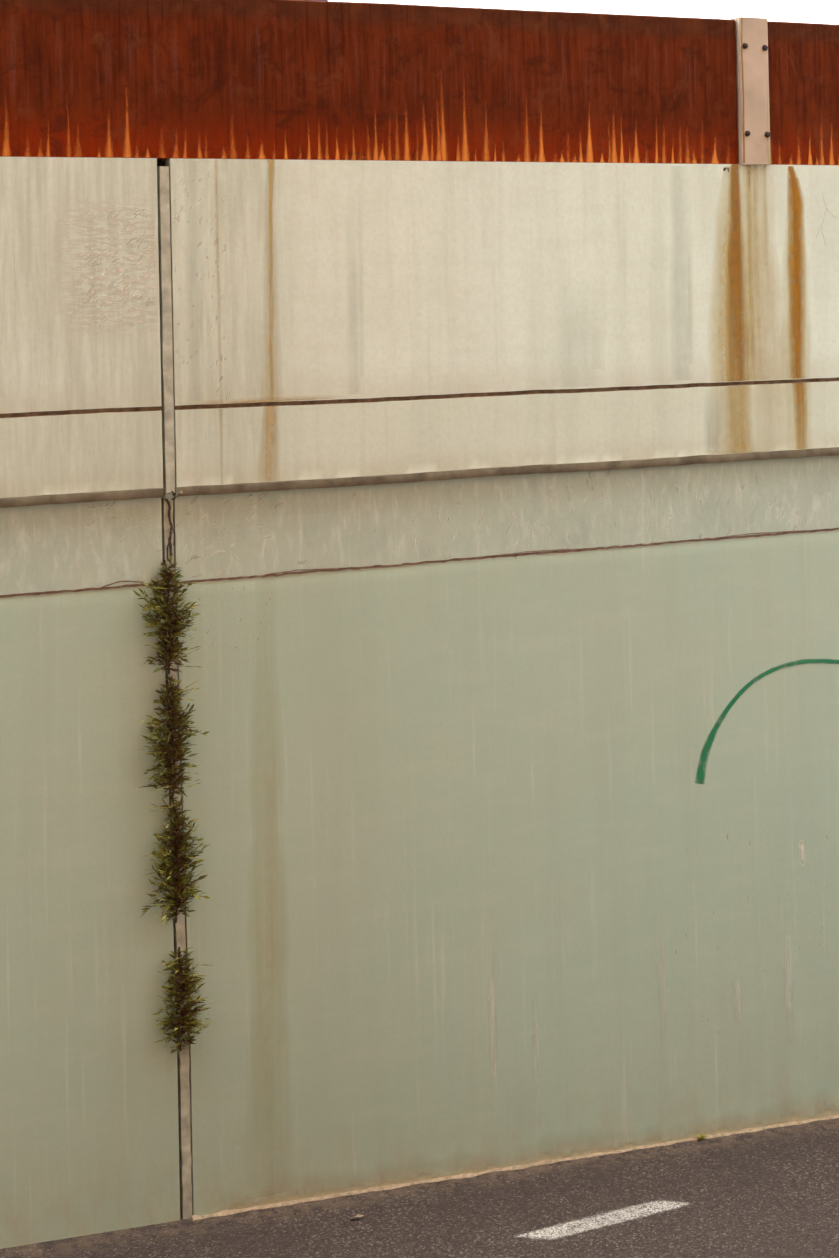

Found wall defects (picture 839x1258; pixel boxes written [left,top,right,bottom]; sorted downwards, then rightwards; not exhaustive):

corrosion [2,116,51,157]
corrosion [97,18,751,382]